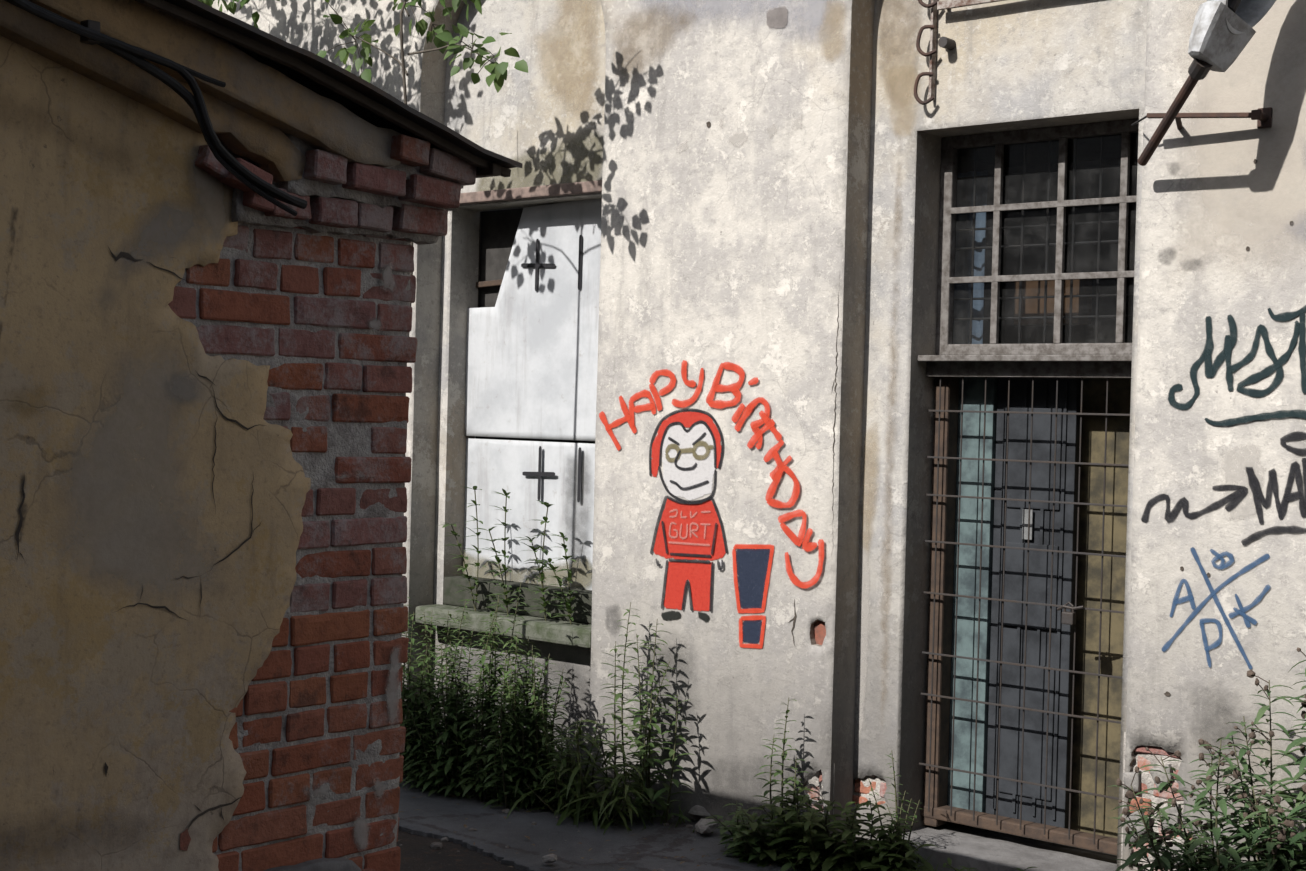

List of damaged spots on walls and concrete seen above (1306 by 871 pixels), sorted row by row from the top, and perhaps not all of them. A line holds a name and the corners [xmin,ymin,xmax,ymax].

crack [195,370,266,513]
crack [16,477,25,561]
crack [118,475,262,621]
flaking render [168,133,477,871]
flaking render [814,620,826,645]
crack [180,797,242,851]
flaking render [803,771,834,821]
flaking render [852,775,887,805]
flaking render [1121,732,1206,871]